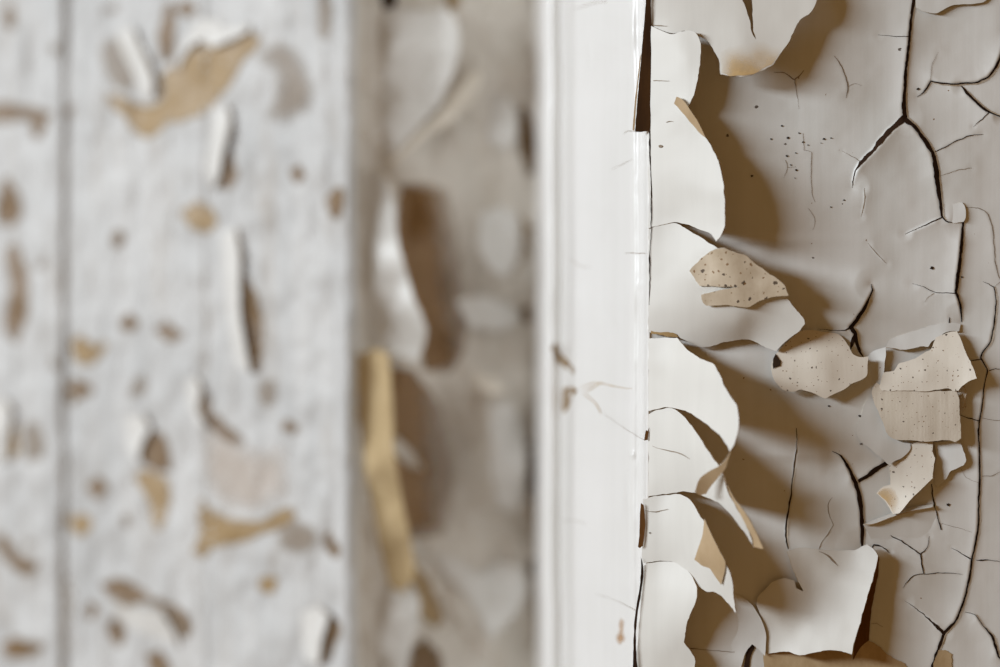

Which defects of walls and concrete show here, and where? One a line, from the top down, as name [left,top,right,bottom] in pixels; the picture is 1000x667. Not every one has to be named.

peeling [637,0,986,667]
crack [824,284,874,357]
crack [832,0,1000,667]
crack [785,428,797,549]
crack [819,498,838,566]